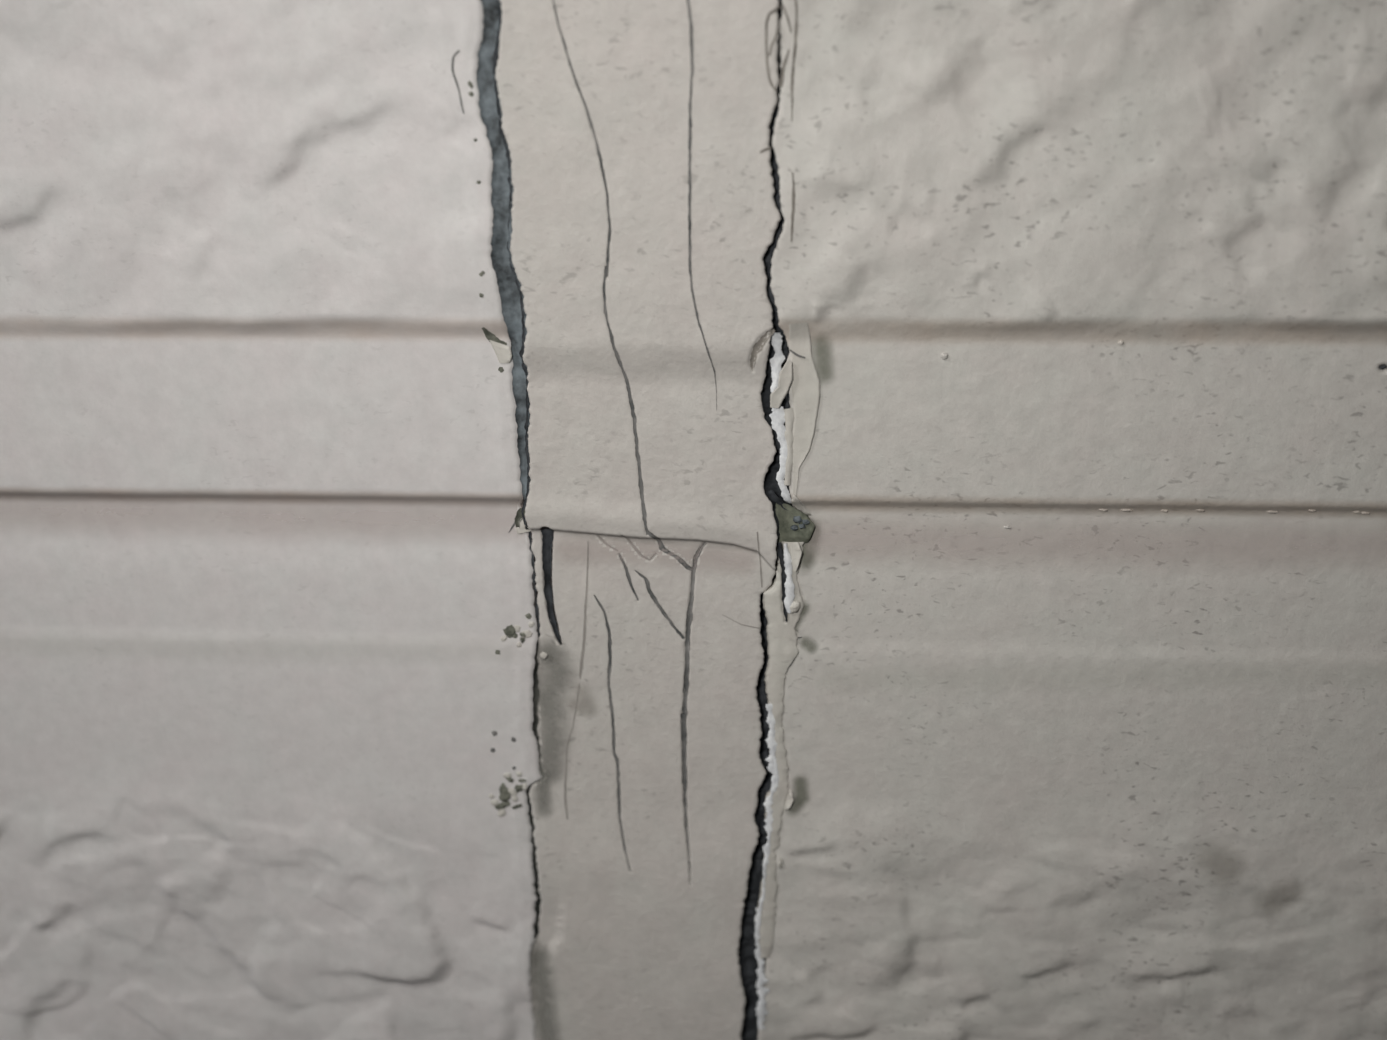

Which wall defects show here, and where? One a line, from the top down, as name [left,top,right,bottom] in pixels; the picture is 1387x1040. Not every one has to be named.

crack [451,0,808,1040]
peeling [767,322,820,613]